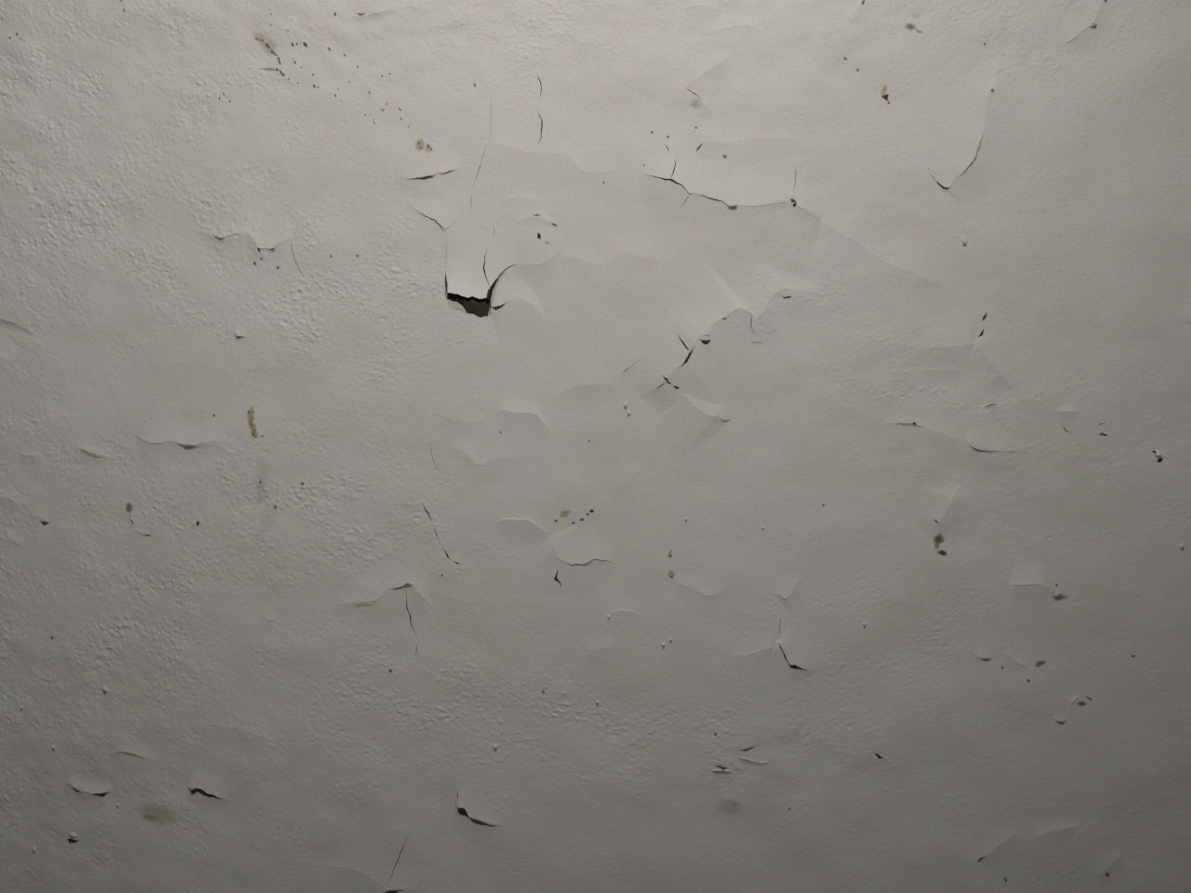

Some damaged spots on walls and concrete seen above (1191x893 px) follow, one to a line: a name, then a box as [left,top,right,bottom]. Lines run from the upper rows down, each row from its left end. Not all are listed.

peeling [445,228,545,348]
peeling [633,262,834,444]
peeling [64,771,113,816]